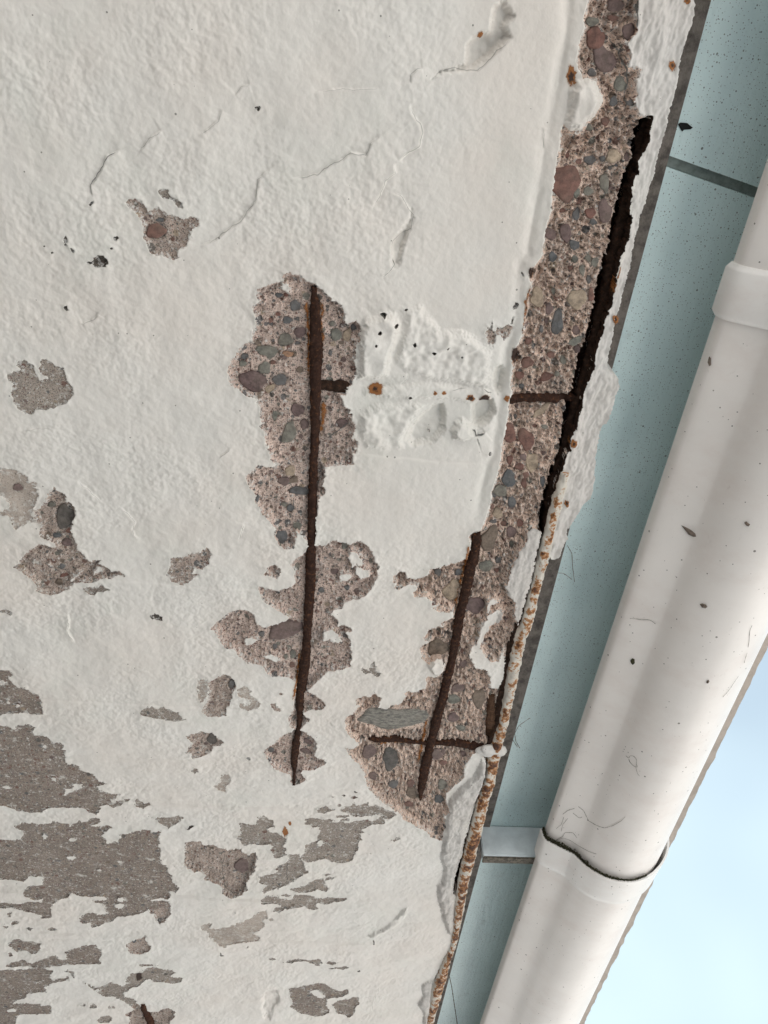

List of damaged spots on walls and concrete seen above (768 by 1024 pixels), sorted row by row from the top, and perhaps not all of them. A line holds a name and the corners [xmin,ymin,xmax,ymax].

peeling [126,189,199,260]
peeling [7,359,74,414]
rust [368,382,383,395]
rust [504,392,575,404]
spalling [184,0,653,956]
spalling [0,467,125,595]
peeling [166,547,212,585]
rust [290,286,350,786]
rust [368,531,496,801]
peeling [0,670,193,1024]
peeling [269,958,360,972]
peeling [289,982,359,1018]